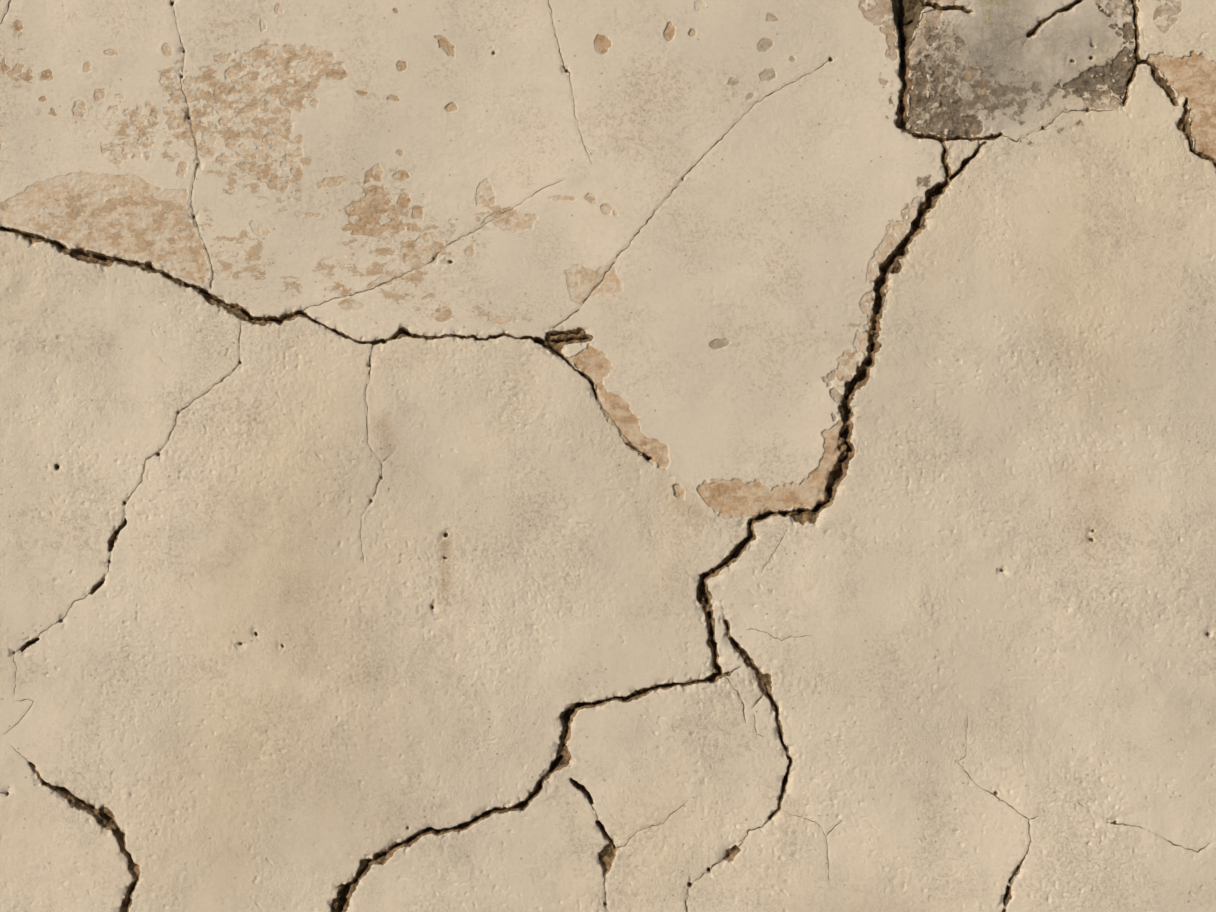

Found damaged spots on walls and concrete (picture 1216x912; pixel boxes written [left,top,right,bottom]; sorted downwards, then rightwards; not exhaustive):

peeling [0,0,349,284]
peeling [317,164,475,323]
crack [0,0,833,912]
peeling [435,36,455,57]
peeling [475,179,538,233]
peeling [564,264,623,304]
peeling [566,344,670,471]
crack [331,0,1216,912]
peeling [673,175,931,519]
spalling [859,0,1216,160]